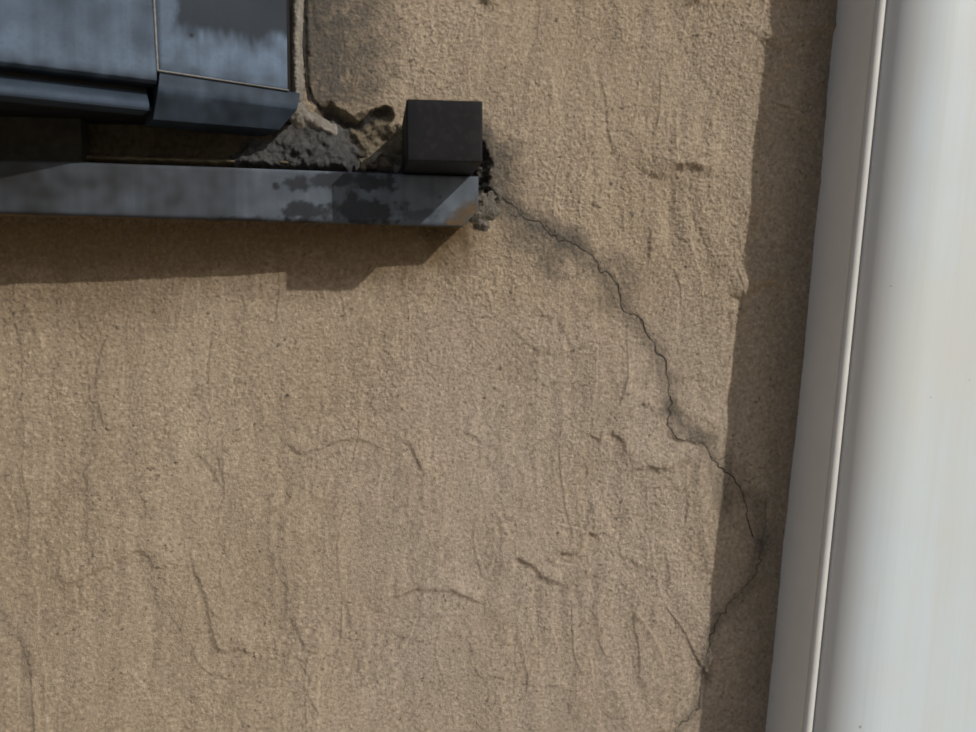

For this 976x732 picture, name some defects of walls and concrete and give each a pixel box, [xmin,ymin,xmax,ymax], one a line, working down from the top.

spalling [315,101,402,174]
spalling [469,140,502,231]
crack [480,190,763,565]